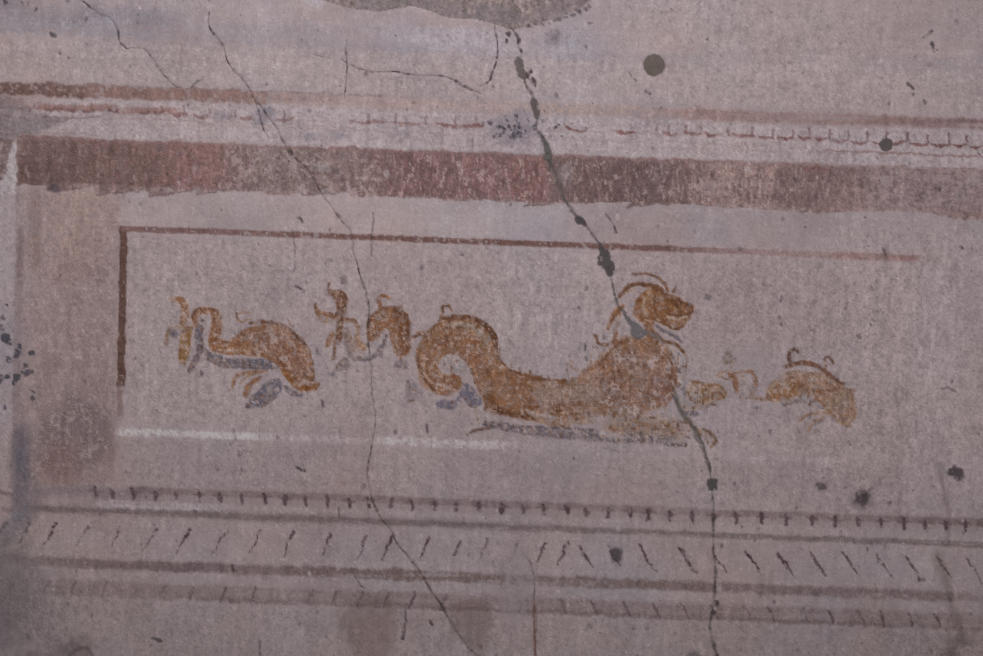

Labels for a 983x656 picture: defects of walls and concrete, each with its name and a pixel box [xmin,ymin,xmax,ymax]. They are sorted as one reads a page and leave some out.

flaking render [324,0,592,30]
crack [440,32,552,162]
crack [564,199,662,342]
crack [674,391,719,656]